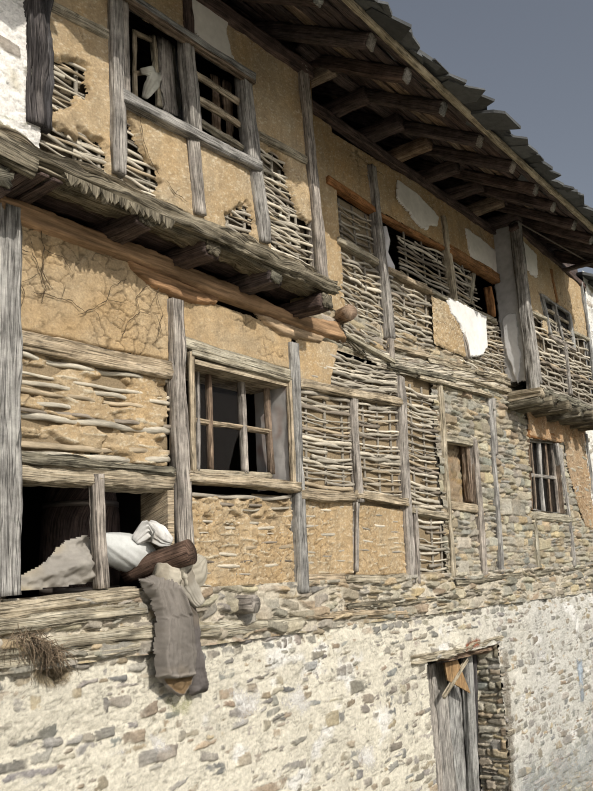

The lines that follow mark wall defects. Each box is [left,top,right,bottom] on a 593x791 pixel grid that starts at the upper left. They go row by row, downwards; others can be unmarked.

spalling [52,62,86,111]
spalling [39,128,107,173]
spalling [121,123,158,197]
spalling [224,204,252,233]
spalling [260,148,313,266]
peeling [396,180,439,230]
peeling [465,228,497,272]
crack [21,231,163,340]
peeling [447,297,488,358]